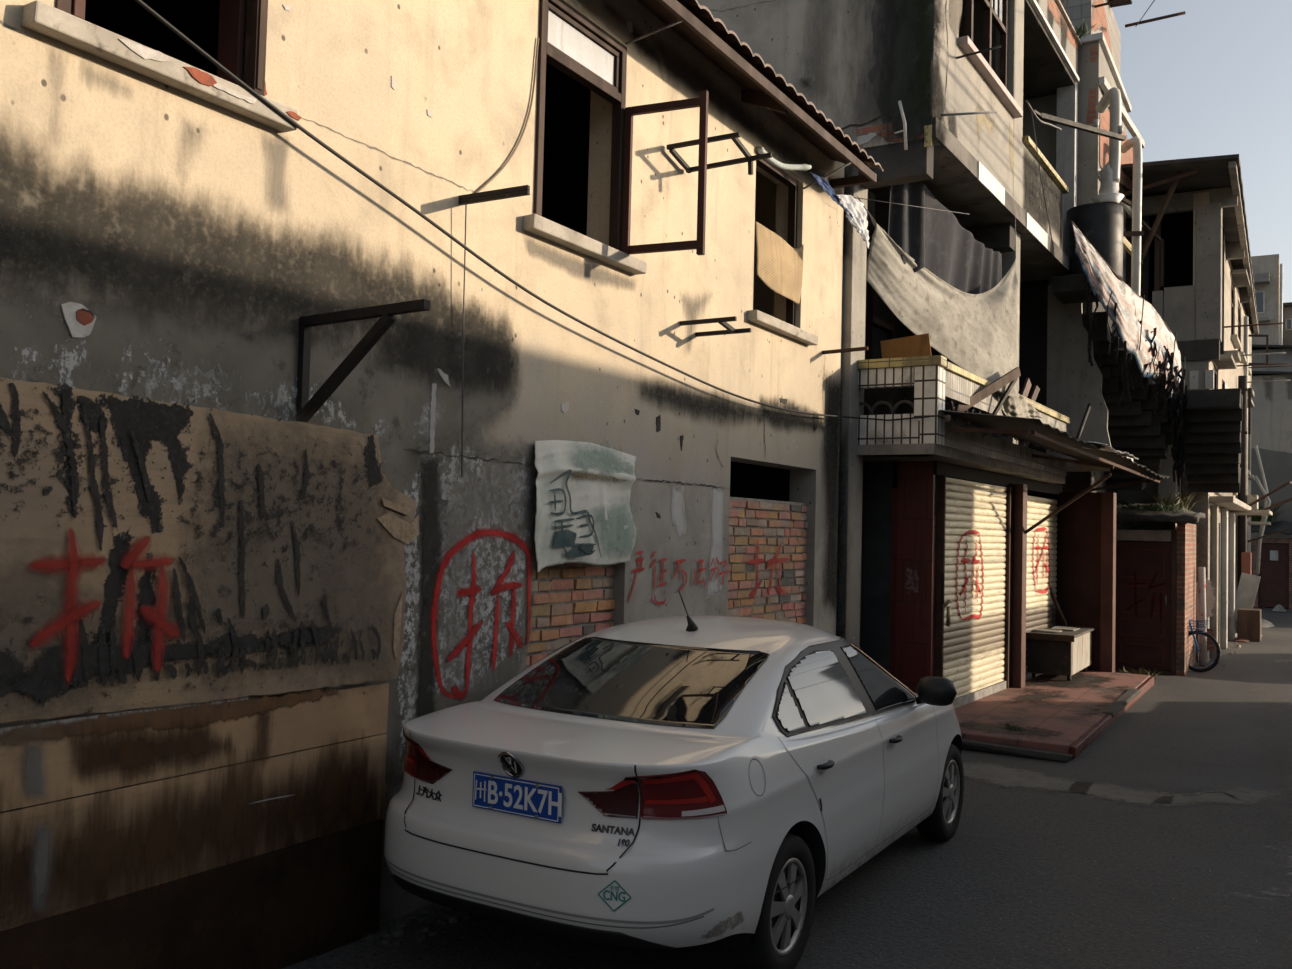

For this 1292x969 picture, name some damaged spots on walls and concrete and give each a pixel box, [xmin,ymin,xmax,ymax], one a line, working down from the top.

damp [879,0,945,148]
damp [269,142,285,206]
crack [302,118,475,192]
spalling [13,302,96,388]
peeling [102,339,225,410]
peeling [245,376,356,431]
damp [0,288,538,915]